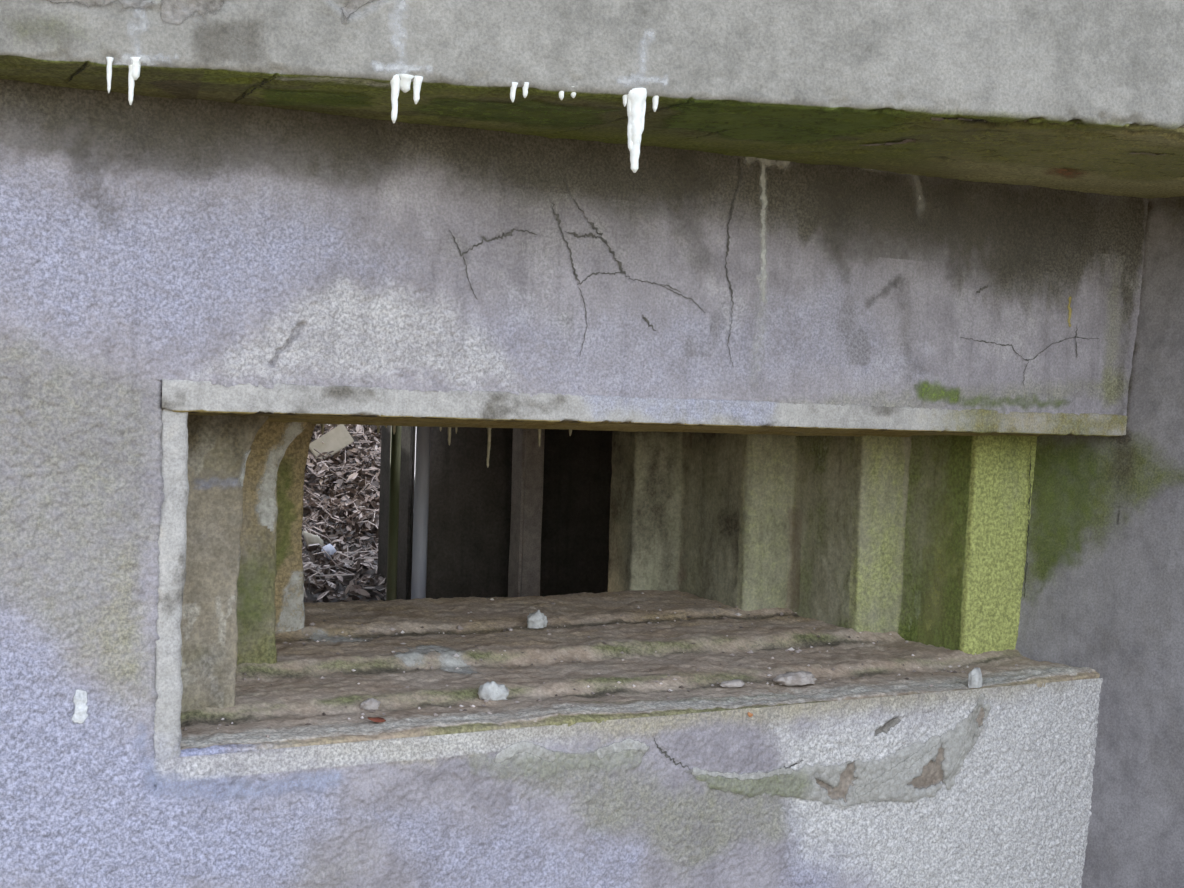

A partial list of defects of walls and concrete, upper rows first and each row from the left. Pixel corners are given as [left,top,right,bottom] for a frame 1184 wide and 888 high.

crack [449,158,743,366]
water stain [747,157,789,301]
crack [961,327,1099,386]
peeling [692,694,991,807]